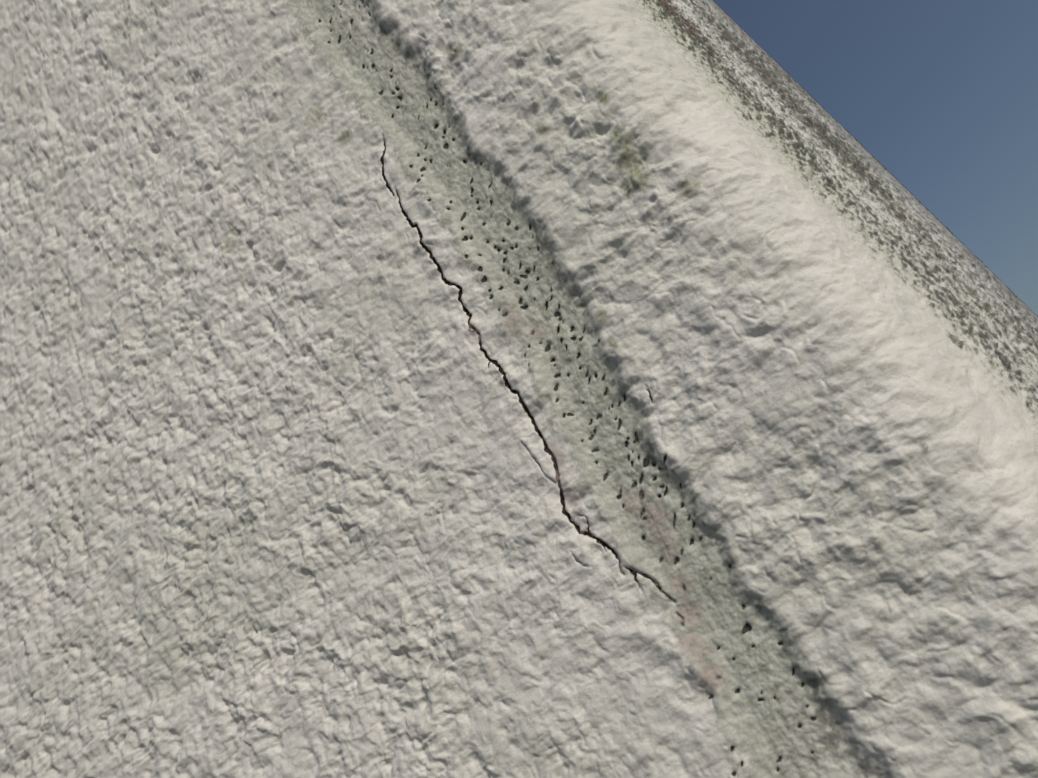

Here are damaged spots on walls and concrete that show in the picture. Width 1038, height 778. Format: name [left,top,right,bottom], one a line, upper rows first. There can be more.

crack [380,137,684,626]